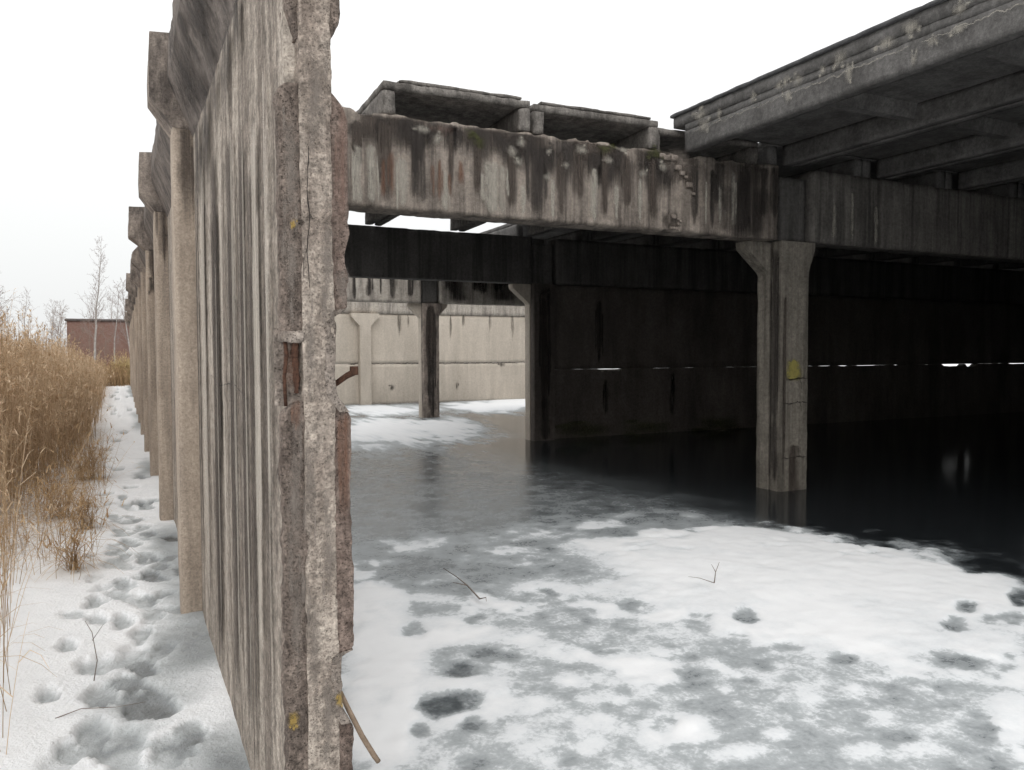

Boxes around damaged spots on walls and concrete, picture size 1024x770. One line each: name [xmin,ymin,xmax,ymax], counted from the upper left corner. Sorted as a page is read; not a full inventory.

crack [303,146,316,287]
water stain [350,114,779,238]
water stain [769,253,799,491]